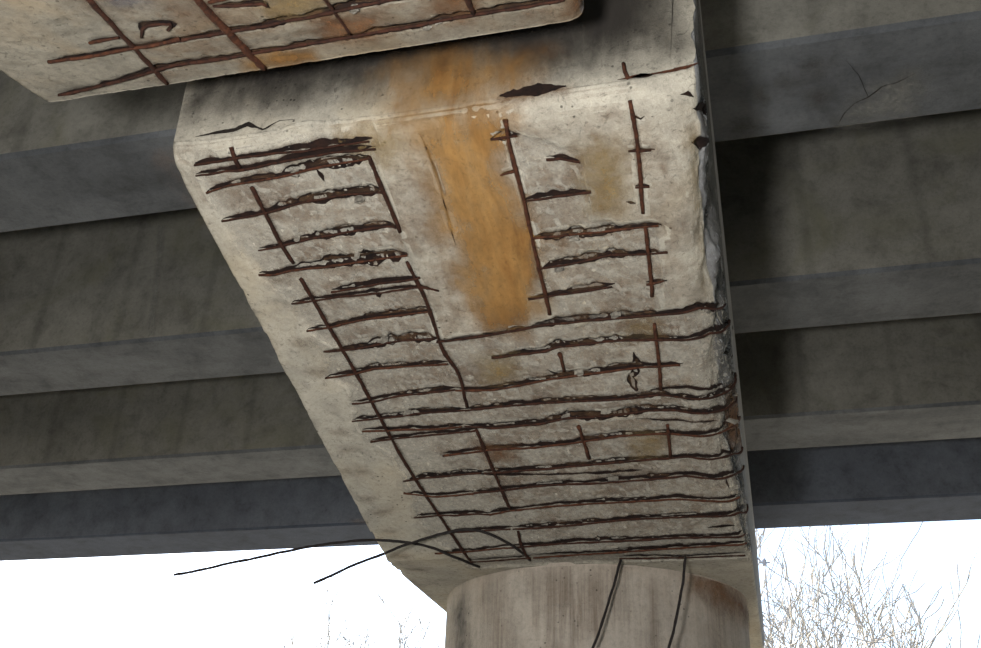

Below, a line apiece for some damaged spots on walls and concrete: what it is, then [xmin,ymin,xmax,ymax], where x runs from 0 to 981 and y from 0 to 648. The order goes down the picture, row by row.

spalling [47,0,565,96]
spalling [173,0,752,648]
corrosion [395,55,539,331]